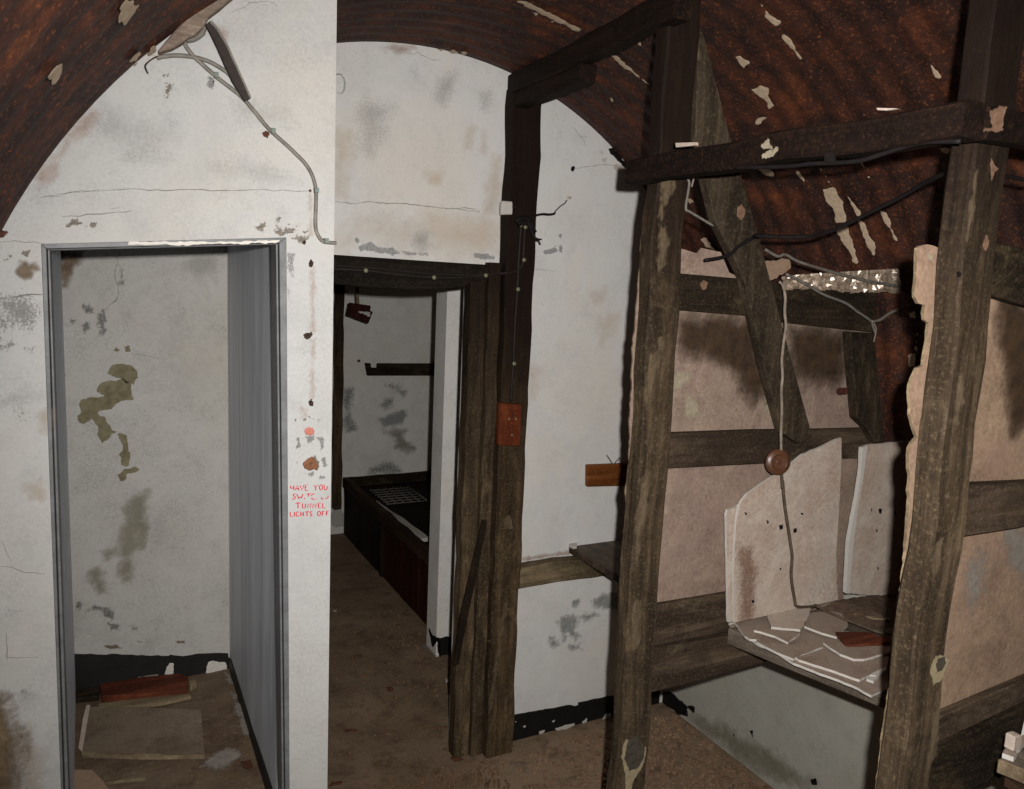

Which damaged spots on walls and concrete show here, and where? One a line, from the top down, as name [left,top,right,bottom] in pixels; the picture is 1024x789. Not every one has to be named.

crack [40,188,300,217]
crack [345,201,479,212]
peeling [820,168,876,264]
peeling [880,211,897,241]
water stain [679,317,770,414]
water stain [674,371,703,419]
water stain [378,400,413,448]
spalling [296,436,326,479]
water stain [550,593,618,649]